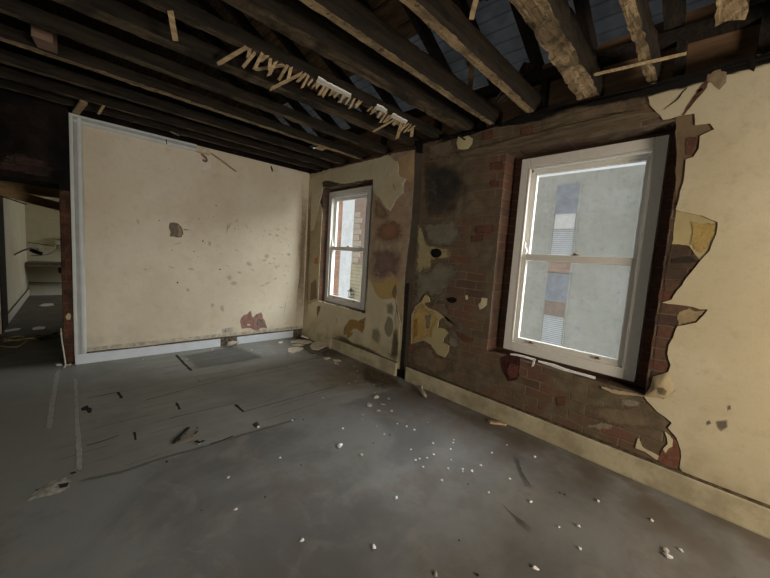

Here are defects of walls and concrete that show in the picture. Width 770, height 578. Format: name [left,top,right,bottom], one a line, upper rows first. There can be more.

crack [666,78,709,115]
flaking render [707,69,727,90]
flaking render [169,223,187,238]
flaking render [306,203,323,316]
flaking render [368,96,718,471]
peeling [222,311,267,334]